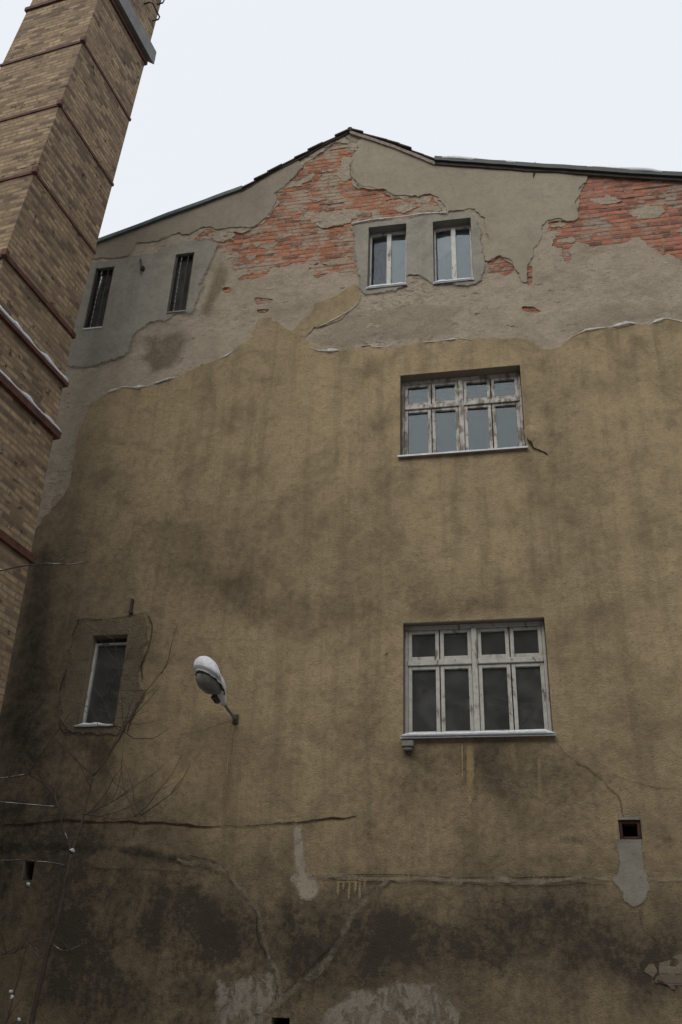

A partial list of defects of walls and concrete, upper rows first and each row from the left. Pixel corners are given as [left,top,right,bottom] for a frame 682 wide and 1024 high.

flaking render [36,134,682,528]
crack [0,815,357,828]
crack [176,855,610,1018]
flaking render [644,955,682,990]